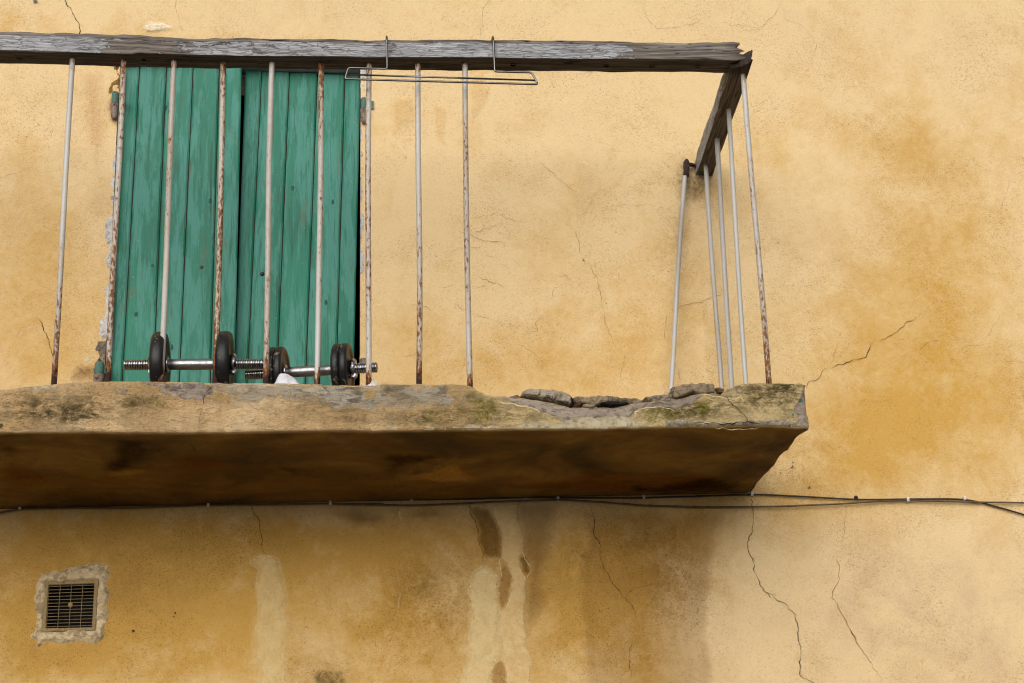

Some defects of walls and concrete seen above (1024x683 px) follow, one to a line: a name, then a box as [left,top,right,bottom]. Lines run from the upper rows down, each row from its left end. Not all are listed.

spalling [423,383,807,430]
water stain [493,505,531,683]
crack [591,506,652,613]
crack [747,485,814,683]